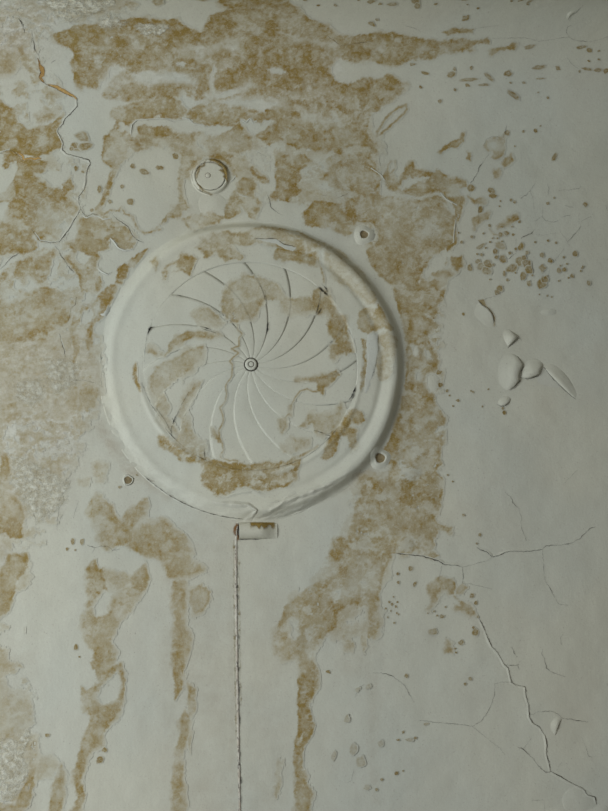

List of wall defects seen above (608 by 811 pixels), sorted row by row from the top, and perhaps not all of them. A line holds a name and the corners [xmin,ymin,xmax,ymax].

damp [486,42,519,58]
damp [446,66,520,101]
damp [69,130,94,152]
damp [436,131,472,162]
damp [482,130,516,180]
crack [35,98,145,266]
damp [475,211,534,287]
damp [536,252,553,295]
damp [131,225,399,498]
crack [397,553,463,570]
damp [0,459,213,811]
crack [476,617,597,805]